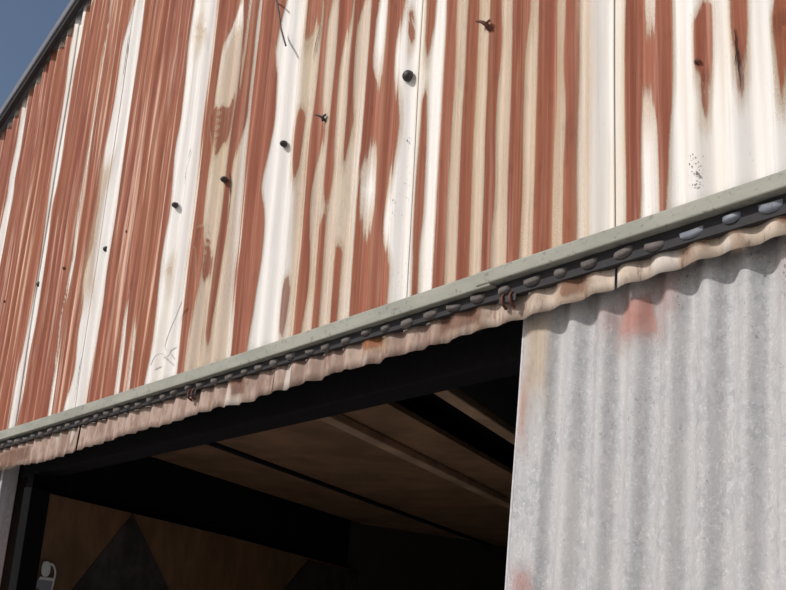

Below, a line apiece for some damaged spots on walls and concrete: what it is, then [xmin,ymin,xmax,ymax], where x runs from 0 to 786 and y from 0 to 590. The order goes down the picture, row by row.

corrosion [0,0,194,431]
corrosion [177,0,287,374]
corrosion [279,0,415,336]
corrosion [411,90,427,296]
corrosion [425,0,436,57]
corrosion [432,0,479,289]
corrosion [481,0,502,272]
corrosion [506,0,580,263]
corrosion [624,0,673,223]
corrosion [693,0,713,118]
corrosion [730,0,748,68]
corrosion [772,0,786,98]